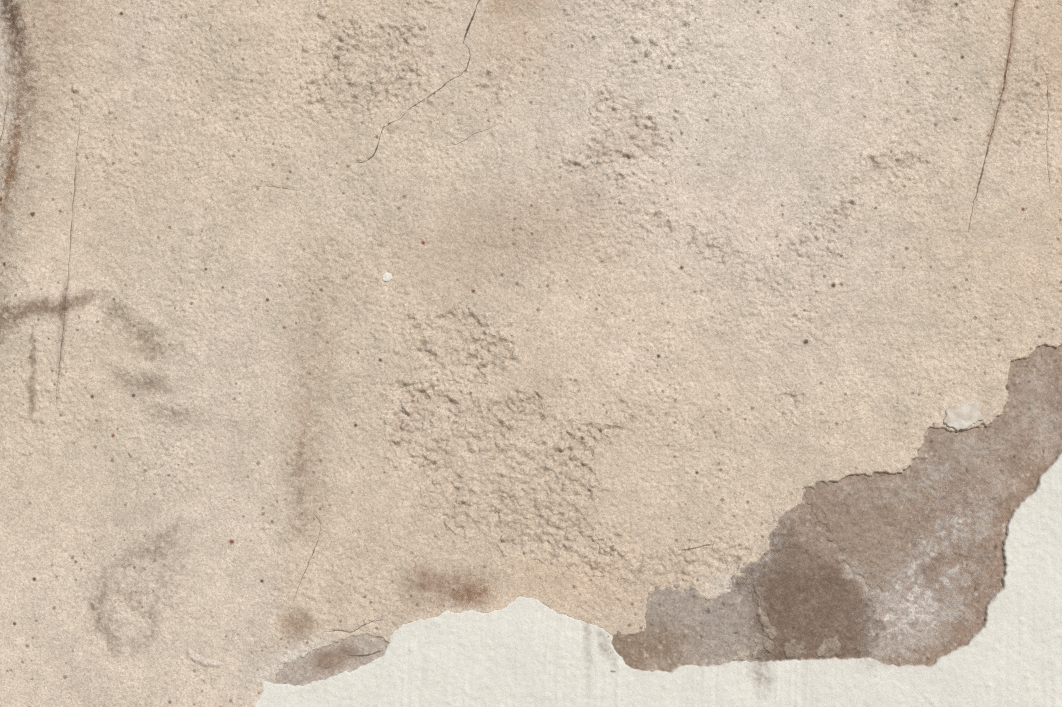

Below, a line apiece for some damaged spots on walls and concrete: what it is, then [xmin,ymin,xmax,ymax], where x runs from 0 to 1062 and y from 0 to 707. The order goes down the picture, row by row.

flaking render [296,0,436,129]
damp [0,296,87,327]
peeling [382,298,1062,673]
peeling [275,634,389,686]